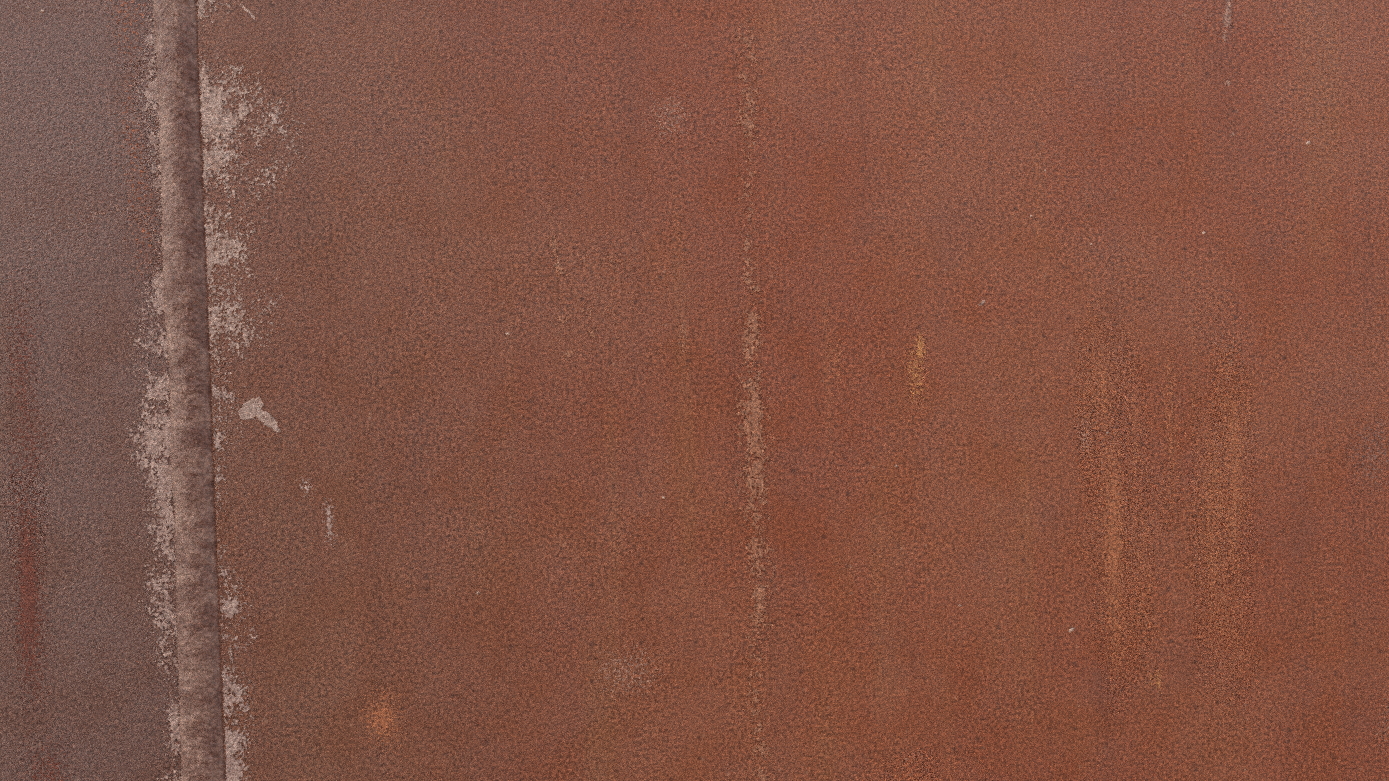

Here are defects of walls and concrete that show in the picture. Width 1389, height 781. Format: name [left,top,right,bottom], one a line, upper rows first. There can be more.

leakage [199,50,307,781]
rust [901,334,933,426]
rust [1068,289,1262,736]